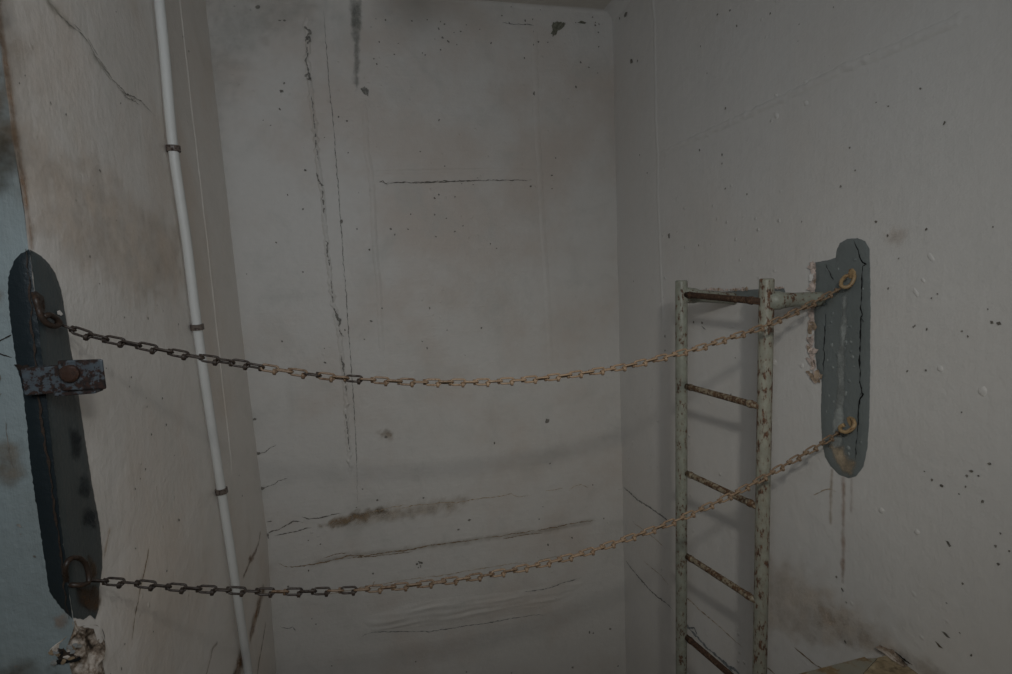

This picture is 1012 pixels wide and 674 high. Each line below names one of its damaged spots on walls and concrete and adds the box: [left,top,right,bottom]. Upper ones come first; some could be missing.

crack [47,0,145,105]
crack [380,178,528,186]
crack [323,11,357,467]
damp [329,509,384,528]
crack [267,492,523,539]
crack [281,520,593,568]
crack [362,579,576,637]
spalling [48,621,106,674]